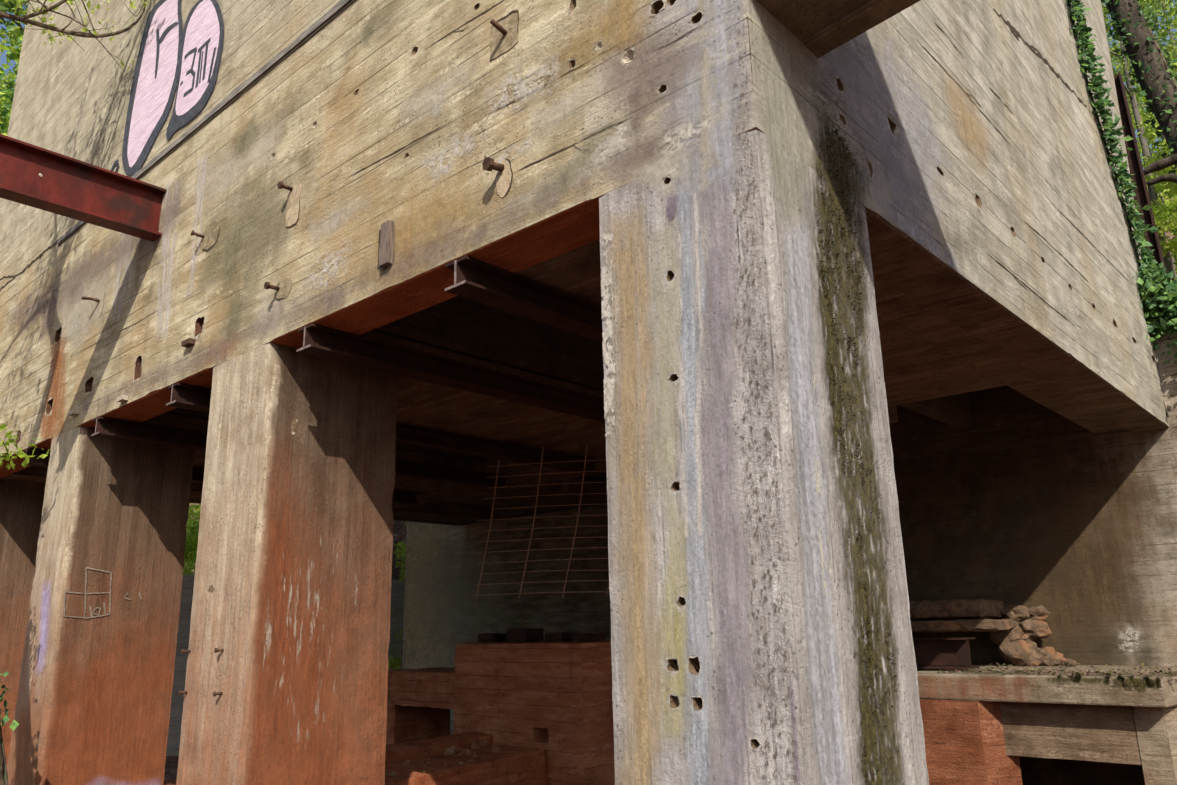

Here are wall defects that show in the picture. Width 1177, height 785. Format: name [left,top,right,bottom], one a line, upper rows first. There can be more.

crack [993,9,1087,107]
rust [42,337,65,437]
water stain [787,225,848,785]
water stain [859,583,883,785]